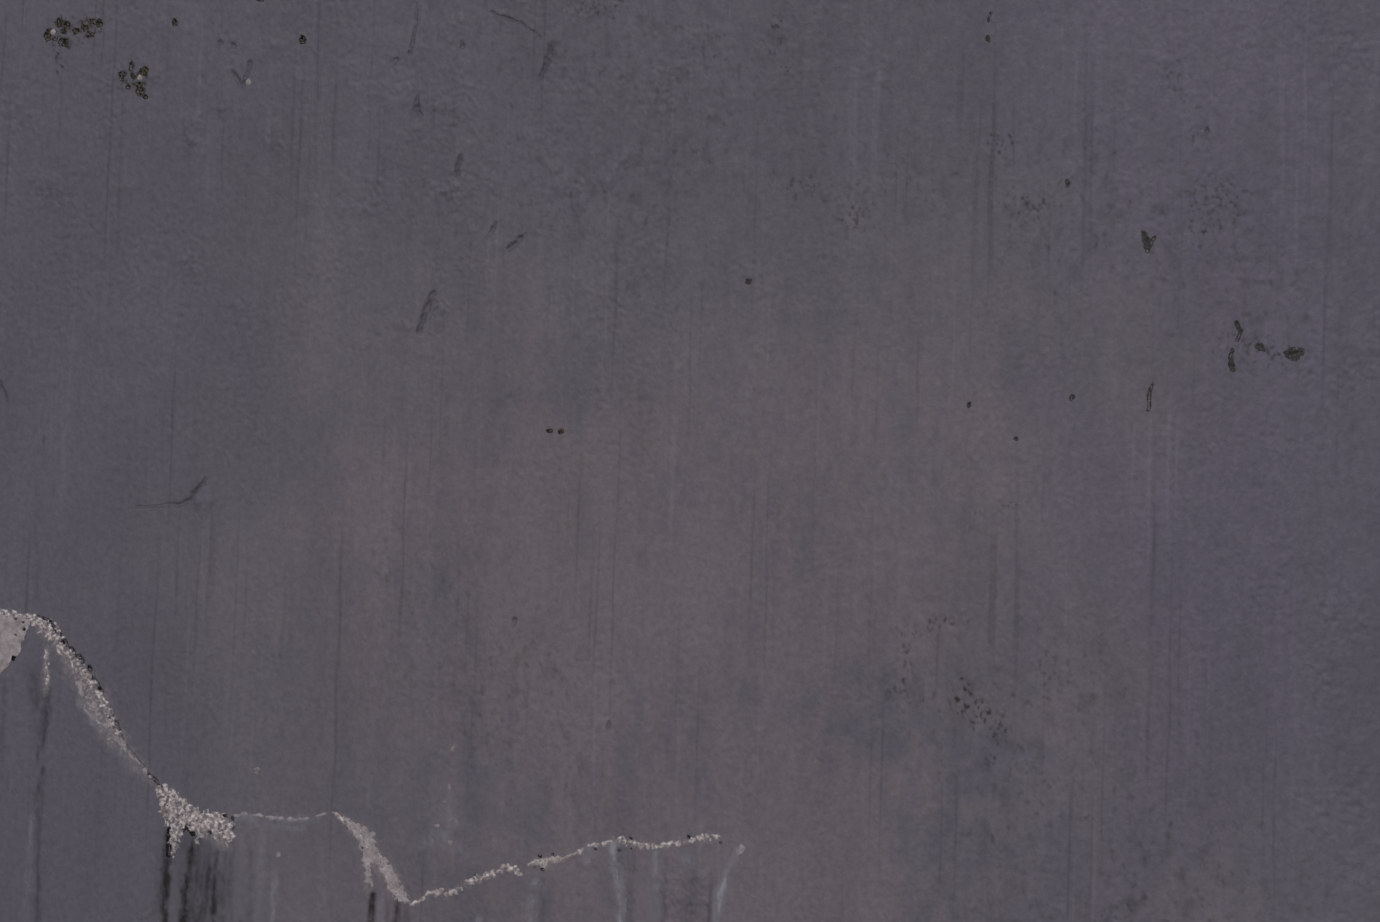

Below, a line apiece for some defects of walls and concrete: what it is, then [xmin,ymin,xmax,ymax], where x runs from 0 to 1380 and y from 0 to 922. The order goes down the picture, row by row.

crack [0,608,163,787]
crack [233,812,334,821]
damp [162,845,188,922]
crack [410,833,722,905]